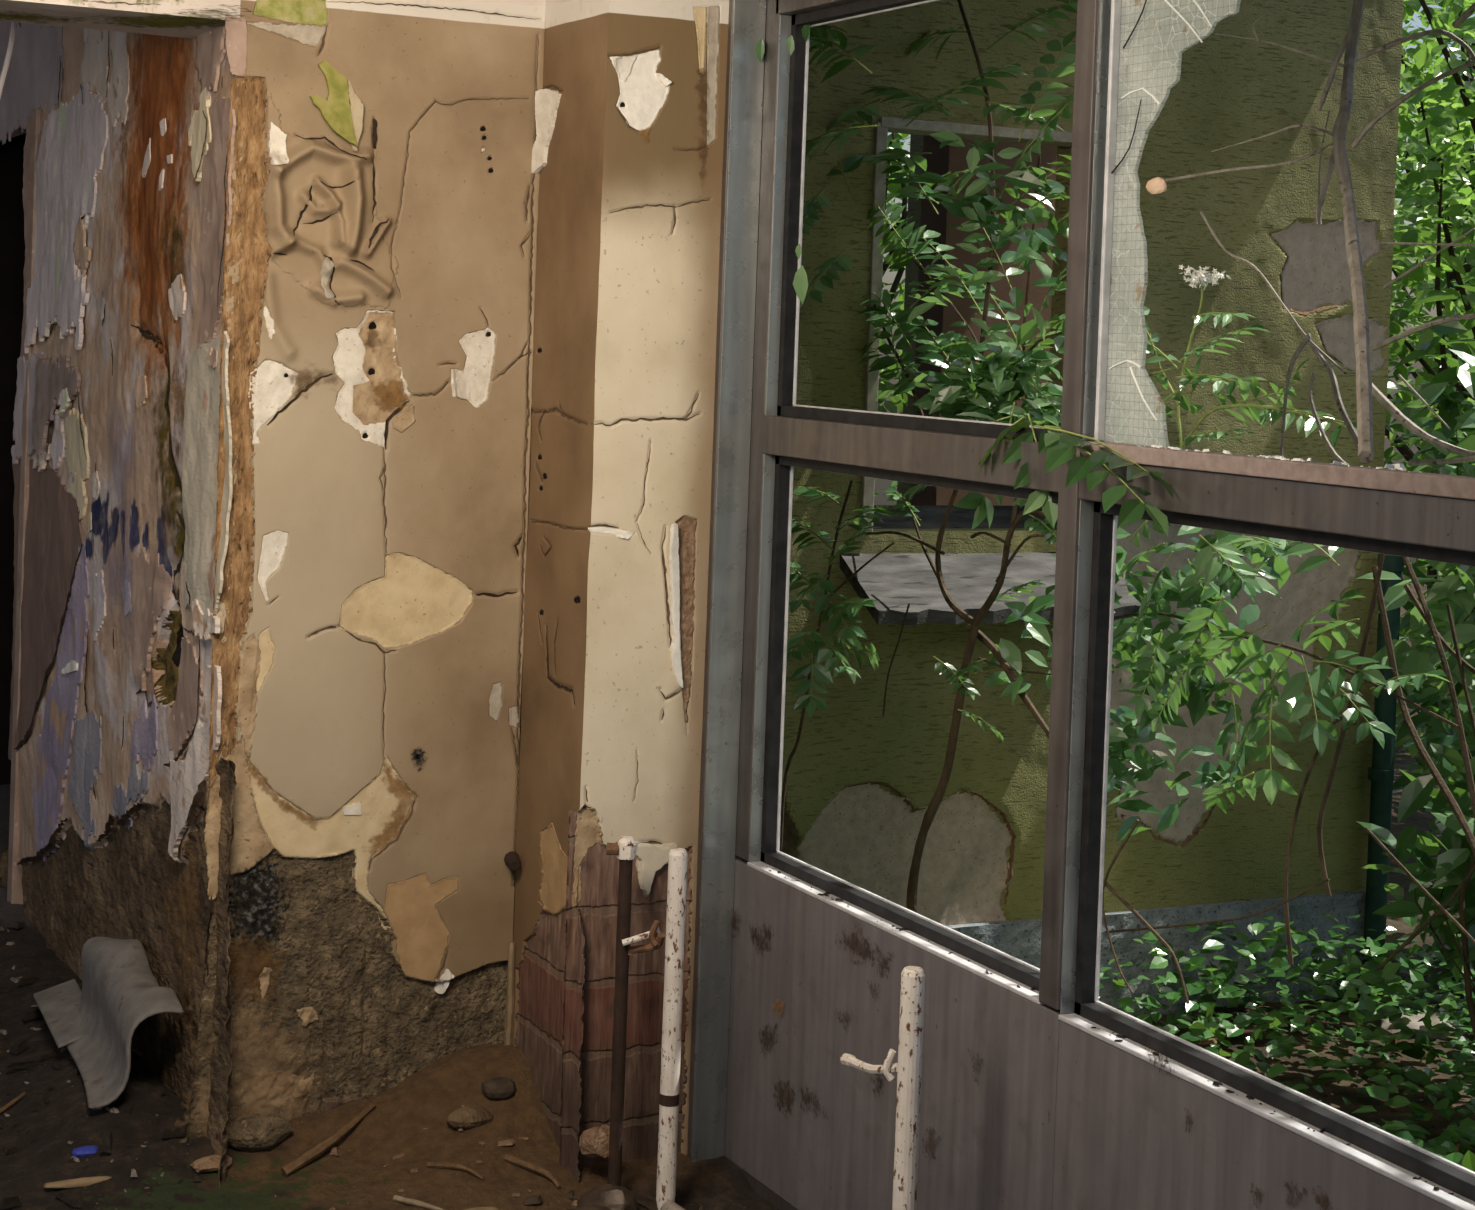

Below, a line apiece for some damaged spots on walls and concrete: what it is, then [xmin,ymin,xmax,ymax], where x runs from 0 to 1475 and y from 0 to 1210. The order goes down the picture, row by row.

rust [114,33,198,391]
spalling [0,0,697,1188]
crack [328,1,708,886]
peeling [694,6,720,160]
spalling [1270,220,1389,373]
spalling [782,782,1016,926]